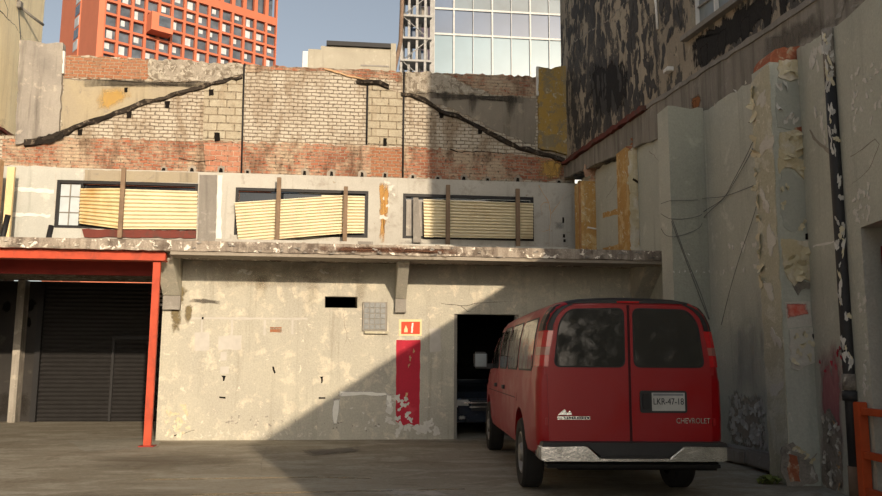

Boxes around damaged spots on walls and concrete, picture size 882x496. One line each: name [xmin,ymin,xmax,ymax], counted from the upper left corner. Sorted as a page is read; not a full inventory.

peeling [809,32,841,157]
peeling [819,174,871,396]
peeling [324,393,440,438]
peeling [821,409,843,491]